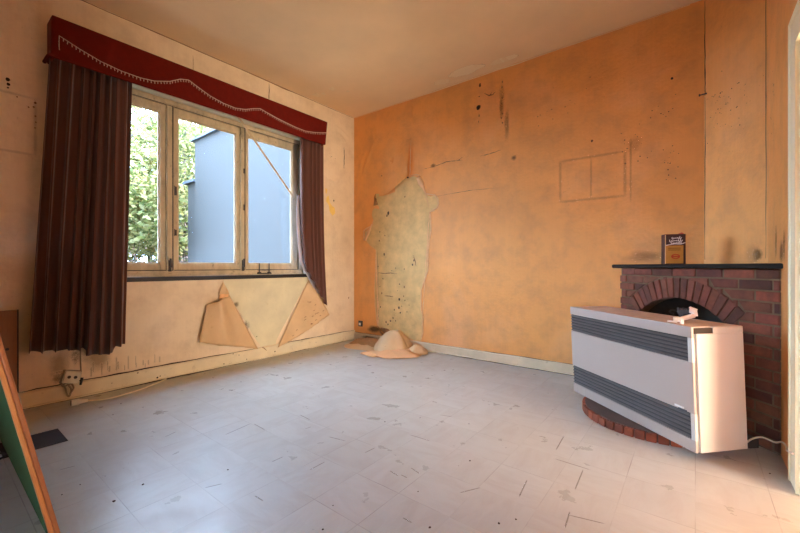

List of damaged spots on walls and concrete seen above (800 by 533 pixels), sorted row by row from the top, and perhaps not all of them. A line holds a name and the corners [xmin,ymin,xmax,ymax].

flaking render [223,277,308,352]
flaking render [365,176,439,341]